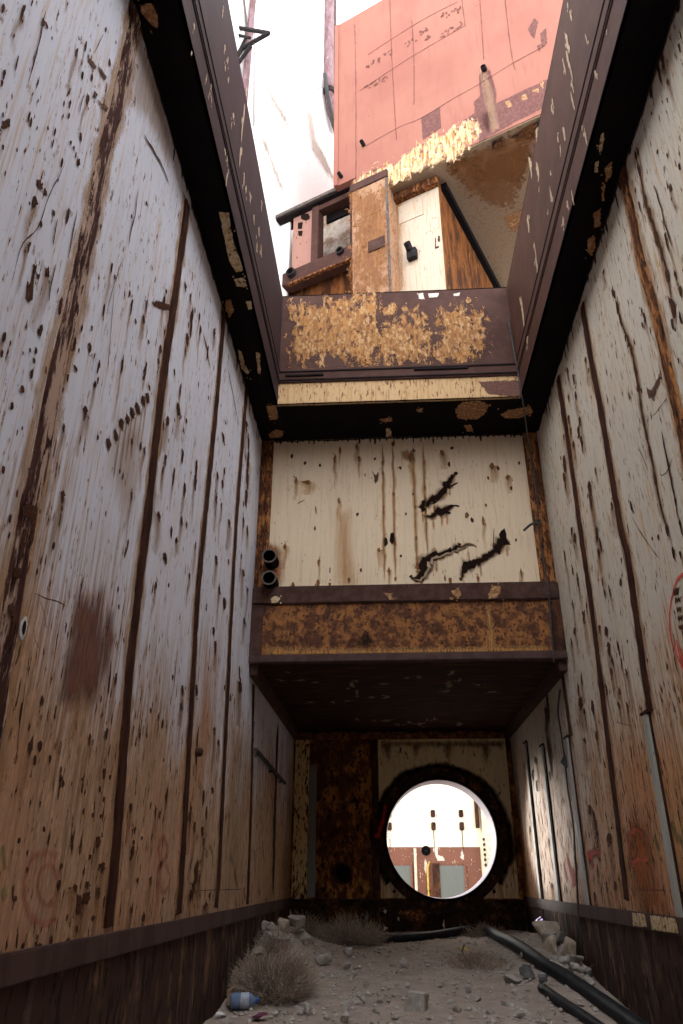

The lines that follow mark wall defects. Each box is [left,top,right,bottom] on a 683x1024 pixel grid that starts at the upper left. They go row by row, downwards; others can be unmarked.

peeling [219,212,252,310]
peeling [224,87,262,257]
peeling [280,118,493,369]
corrosion [447,70,548,232]
corrosion [0,5,141,792]
peeling [455,401,533,432]
corrosion [25,195,253,941]
corrosion [267,606,545,655]